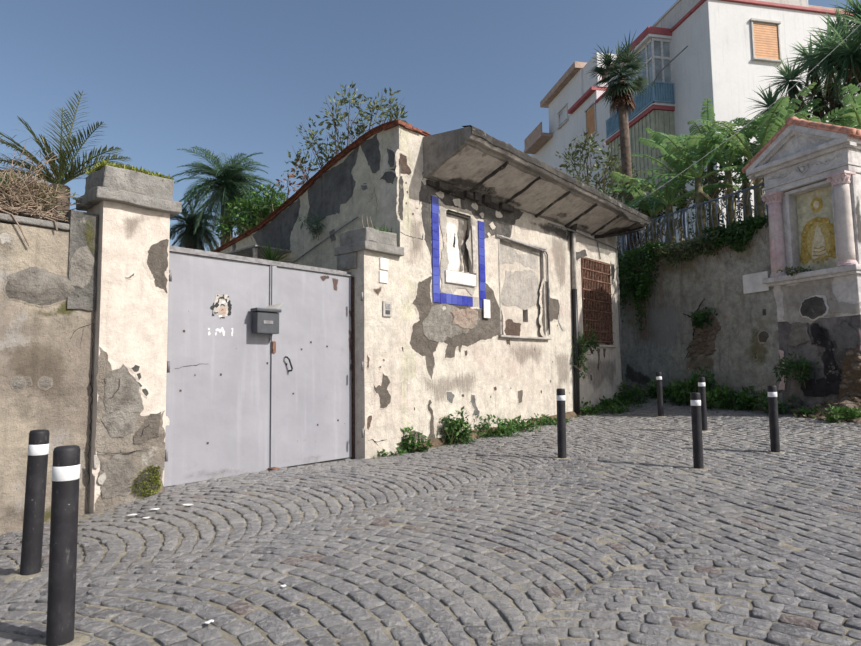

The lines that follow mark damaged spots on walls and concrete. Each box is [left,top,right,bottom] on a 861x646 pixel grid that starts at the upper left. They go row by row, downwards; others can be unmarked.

peeling [125,235,170,294]
peeling [251,133,526,382]
peeling [92,346,170,513]
peeling [364,353,392,432]
spalling [788,295,861,401]